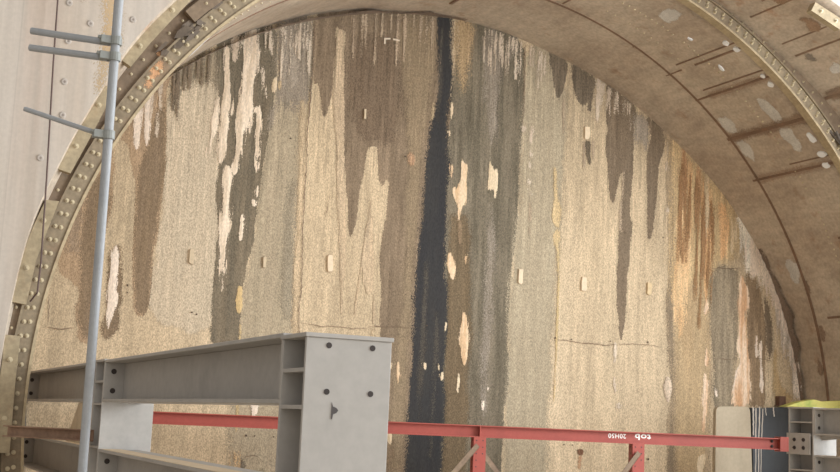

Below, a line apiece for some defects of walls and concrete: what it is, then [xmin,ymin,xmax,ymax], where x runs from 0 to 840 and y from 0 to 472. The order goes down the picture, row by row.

rust [144,49,164,89]
crack [298,20,407,333]
spalling [486,162,498,198]
damp [58,11,802,435]
rust [662,140,744,435]
spalling [458,311,470,365]
damp [221,427,278,472]
damp [485,438,551,472]
damp [664,445,711,472]
rust [671,446,712,472]